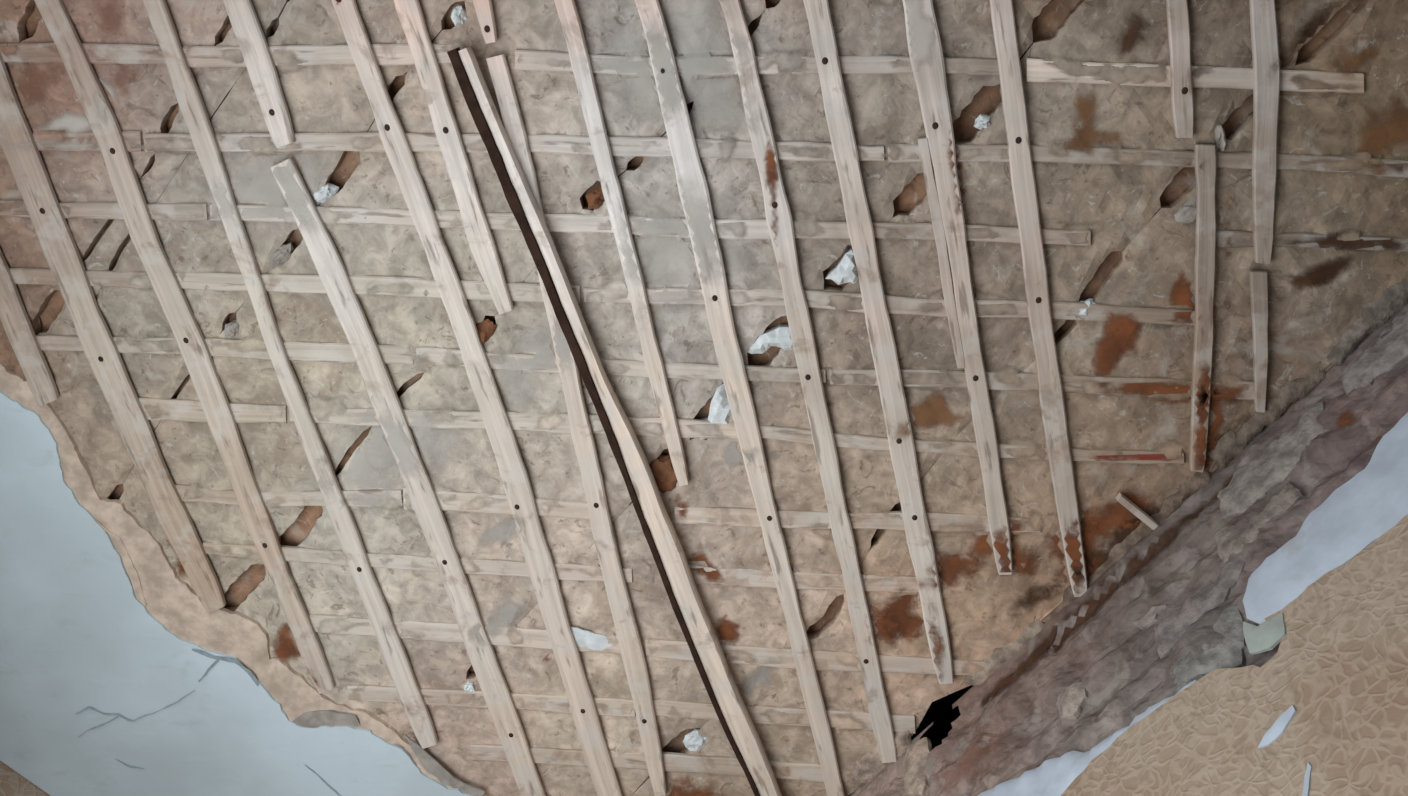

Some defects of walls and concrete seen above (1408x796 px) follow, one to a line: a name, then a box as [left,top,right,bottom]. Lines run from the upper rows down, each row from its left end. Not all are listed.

rust [1068,98,1118,151]
rust [1170,275,1194,323]
rust [903,395,959,435]
rust [1093,314,1241,471]
flaking render [0,362,496,796]
flaking render [571,626,614,651]
rust [871,590,944,664]
peeling [1243,613,1286,655]
crack [75,649,259,738]
peeling [1257,705,1297,749]
peeling [1302,763,1312,796]